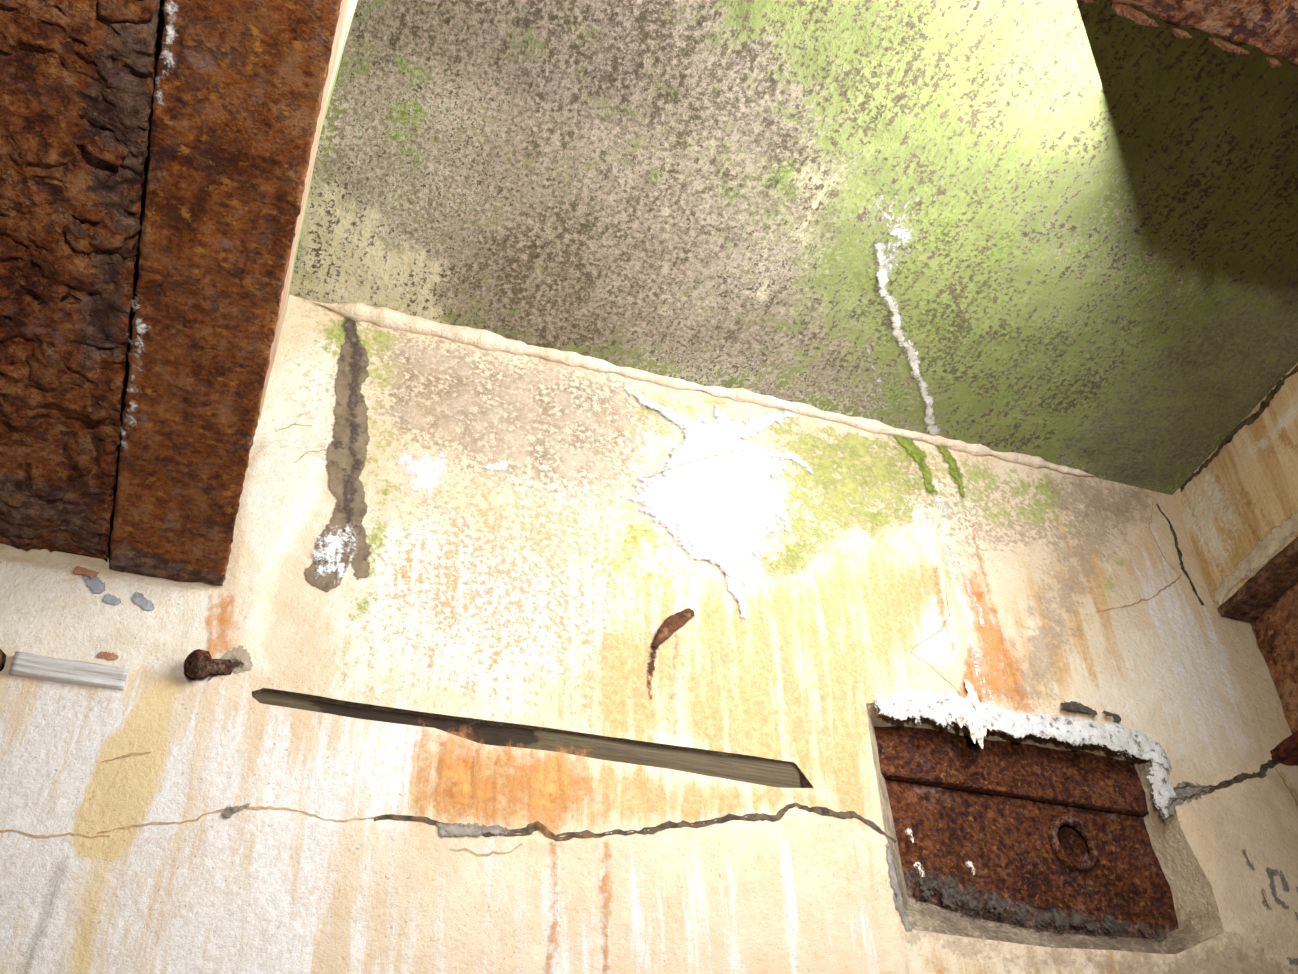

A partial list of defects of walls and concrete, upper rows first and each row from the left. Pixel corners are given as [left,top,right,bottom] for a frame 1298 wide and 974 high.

corrosion [1112,3,1193,38]
corrosion [1209,36,1282,68]
corrosion [79,133,128,167]
corrosion [89,209,142,250]
crack [1096,365,1298,612]
corrosion [647,608,695,699]
corrosion [961,531,1030,710]
damp [874,477,1177,817]
crack [102,752,151,762]
corrosion [422,738,591,820]
crack [1159,760,1279,820]
crack [0,803,897,856]